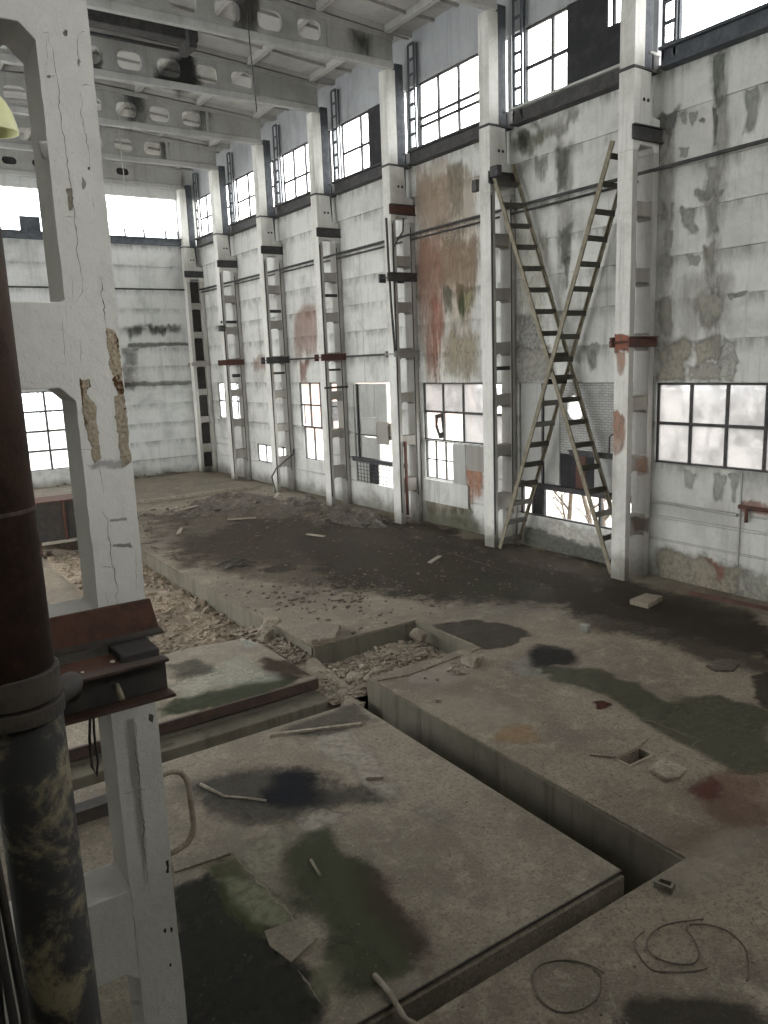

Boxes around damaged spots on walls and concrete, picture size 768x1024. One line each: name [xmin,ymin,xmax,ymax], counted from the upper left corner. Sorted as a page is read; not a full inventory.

crack [46,31,107,360]
leakage [512,129,572,260]
leakage [694,51,728,329]
leakage [127,324,189,348]
corrosion [445,331,477,376]
corrosion [614,334,629,374]
peeling [656,297,738,381]
spalling [79,378,102,464]
spalling [106,328,132,467]
corrosion [613,411,625,452]
corrosion [466,470,482,501]
crack [124,719,152,891]